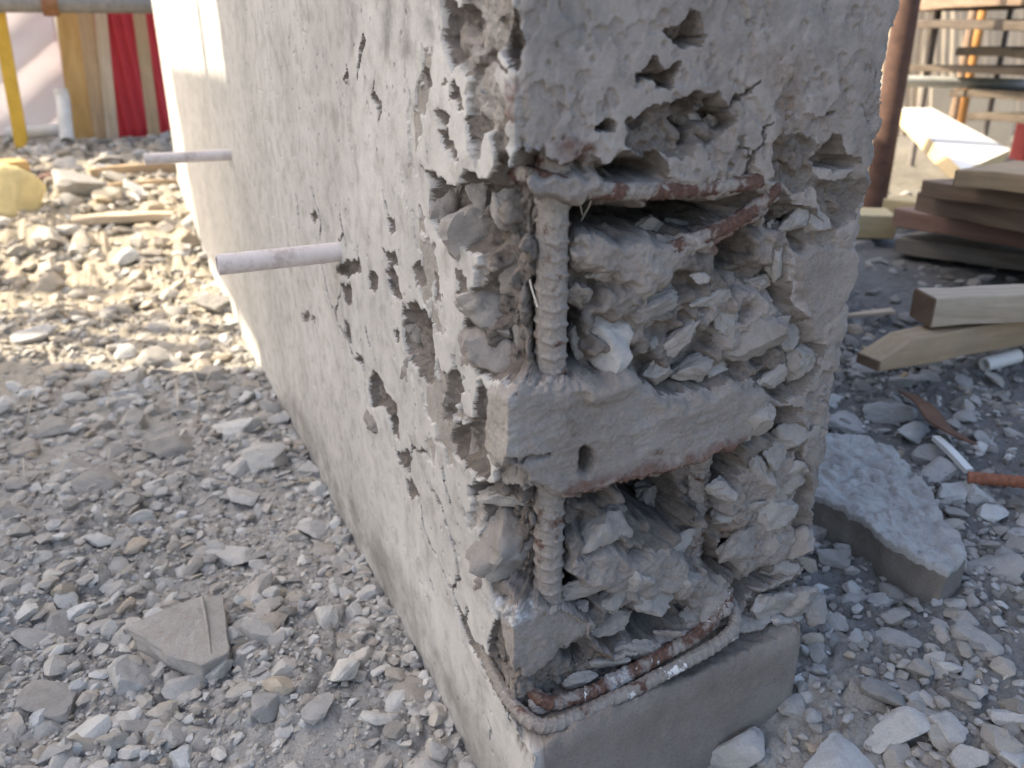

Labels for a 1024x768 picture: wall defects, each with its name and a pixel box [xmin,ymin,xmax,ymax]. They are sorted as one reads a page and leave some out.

peeling [773,79,882,157]
peeling [413,0,860,376]
peeling [426,362,475,465]
peeling [469,501,489,530]
spalling [478,450,828,734]